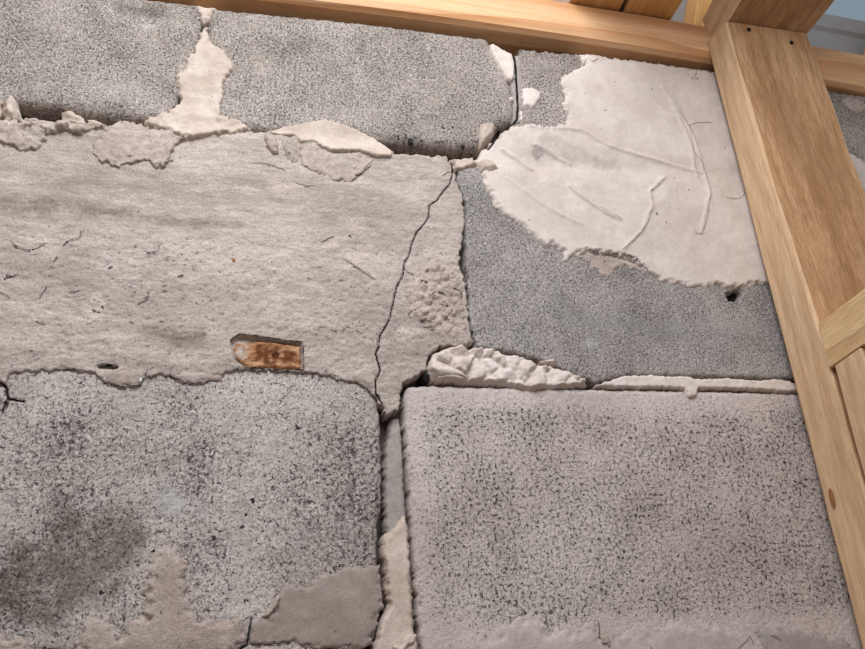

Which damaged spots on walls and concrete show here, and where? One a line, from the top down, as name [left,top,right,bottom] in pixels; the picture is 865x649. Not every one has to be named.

flaking render [578,253,648,279]
crack [375,163,453,404]
corrosion [256,344,296,364]
flaking render [100,370,145,386]
flaking render [173,372,224,385]
flaking render [343,366,377,389]
crack [0,381,25,413]